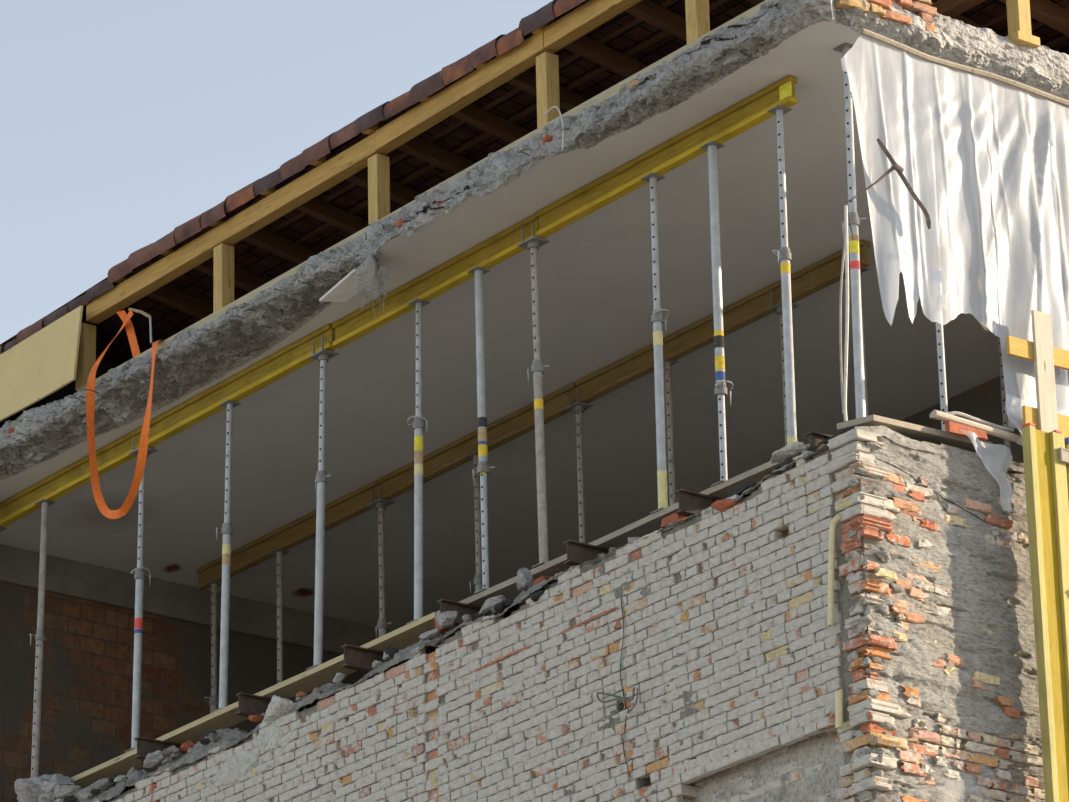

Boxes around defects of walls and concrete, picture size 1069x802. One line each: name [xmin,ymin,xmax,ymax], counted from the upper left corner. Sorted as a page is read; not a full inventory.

flaking render [834,0,938,34]
spalling [542,35,779,157]
flaking render [881,473,937,531]
flaking render [871,567,925,624]
flaking render [932,653,1021,719]